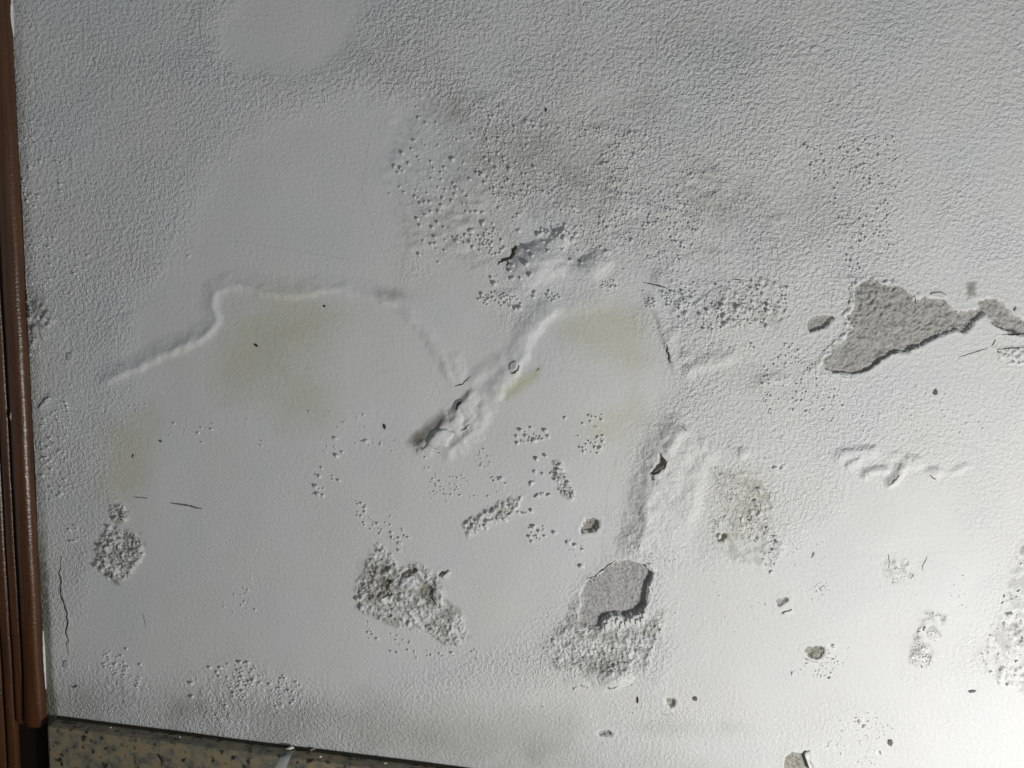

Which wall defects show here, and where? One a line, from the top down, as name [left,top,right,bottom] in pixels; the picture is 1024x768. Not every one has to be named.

spalling [801,275,1024,381]
spalling [88,498,151,591]
spalling [349,537,475,654]
spalling [455,455,605,543]
spalling [537,546,692,756]
spalling [712,467,1024,695]